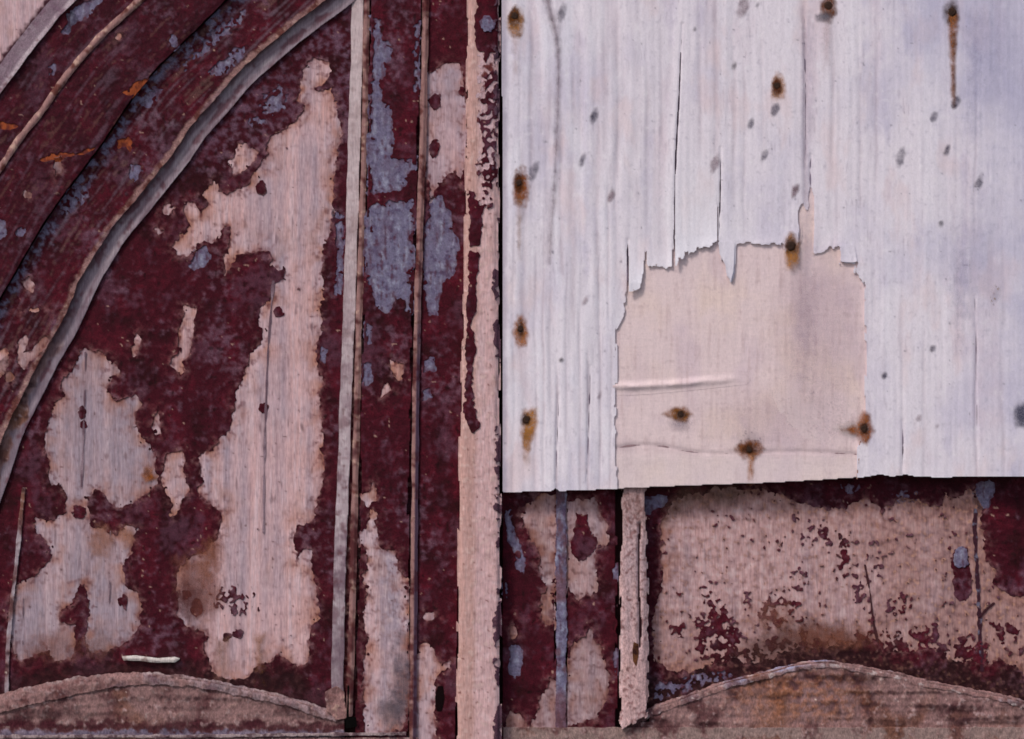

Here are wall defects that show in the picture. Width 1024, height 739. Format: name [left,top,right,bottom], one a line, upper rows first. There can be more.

peeling [361,0,501,433]
rust [514,174,528,204]
crack [673,39,682,242]
rust [945,3,958,91]
peeling [0,58,345,680]
peeling [358,482,451,739]
rust [514,316,528,346]
rust [522,410,536,447]
peeling [493,426,610,630]
peeling [492,629,618,739]
peeling [644,480,1024,700]
rust [847,413,872,443]